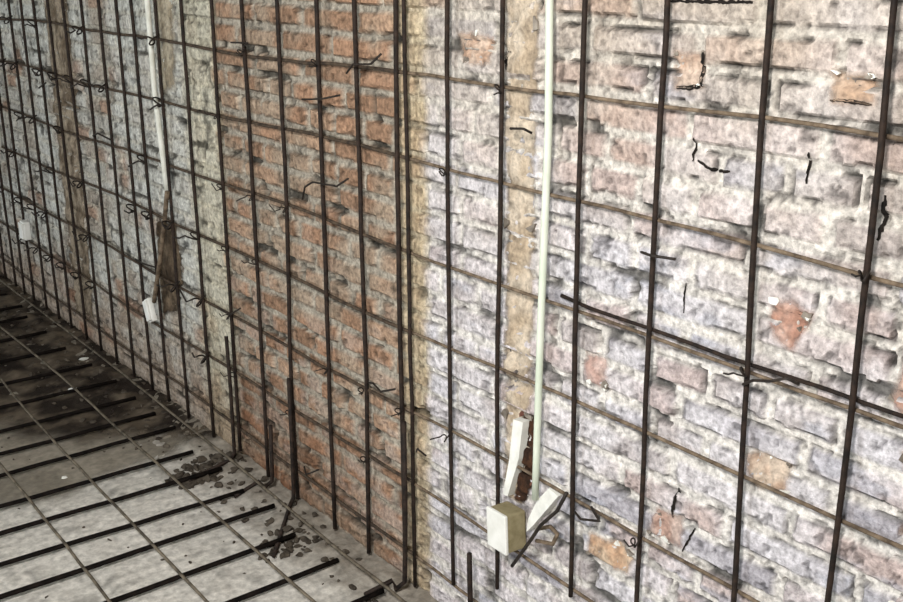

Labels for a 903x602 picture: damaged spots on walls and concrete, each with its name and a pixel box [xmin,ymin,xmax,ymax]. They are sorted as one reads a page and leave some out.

spalling [0,0,545,602]
spalling [514,0,903,602]